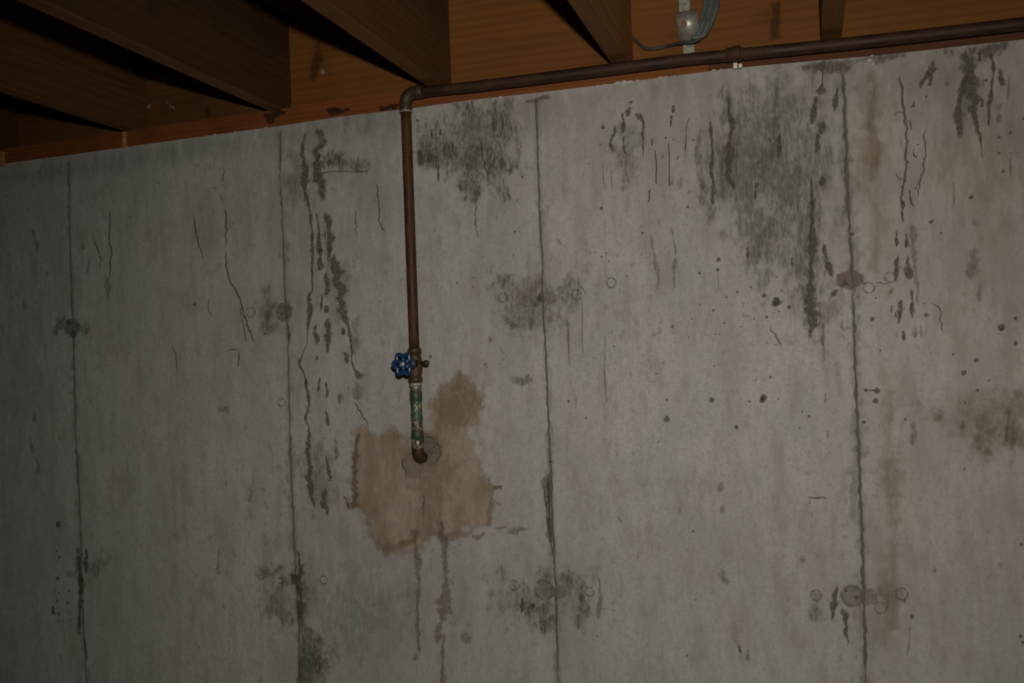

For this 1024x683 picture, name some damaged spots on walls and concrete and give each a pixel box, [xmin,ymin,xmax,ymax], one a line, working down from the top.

leakage [413,95,523,202]
leakage [709,96,735,204]
leakage [803,61,851,153]
crack [896,79,926,220]
leakage [955,42,1008,155]
crack [194,210,254,341]
leakage [298,129,366,513]
leakage [804,177,832,336]